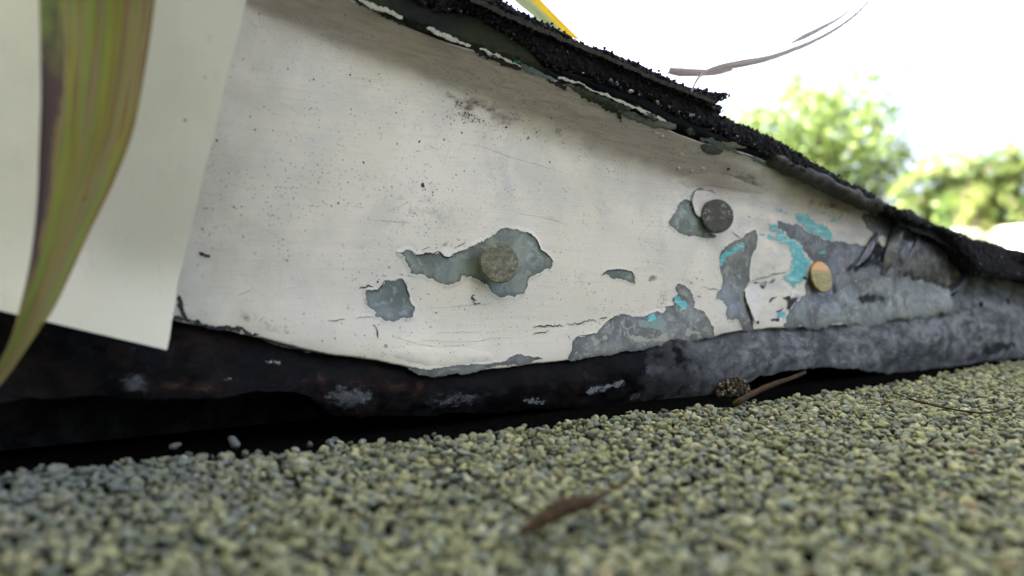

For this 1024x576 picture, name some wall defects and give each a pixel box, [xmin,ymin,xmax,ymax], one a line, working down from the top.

peeling [361,223,556,326]
peeling [567,190,763,361]
peeling [777,213,955,330]
peeling [406,352,542,377]